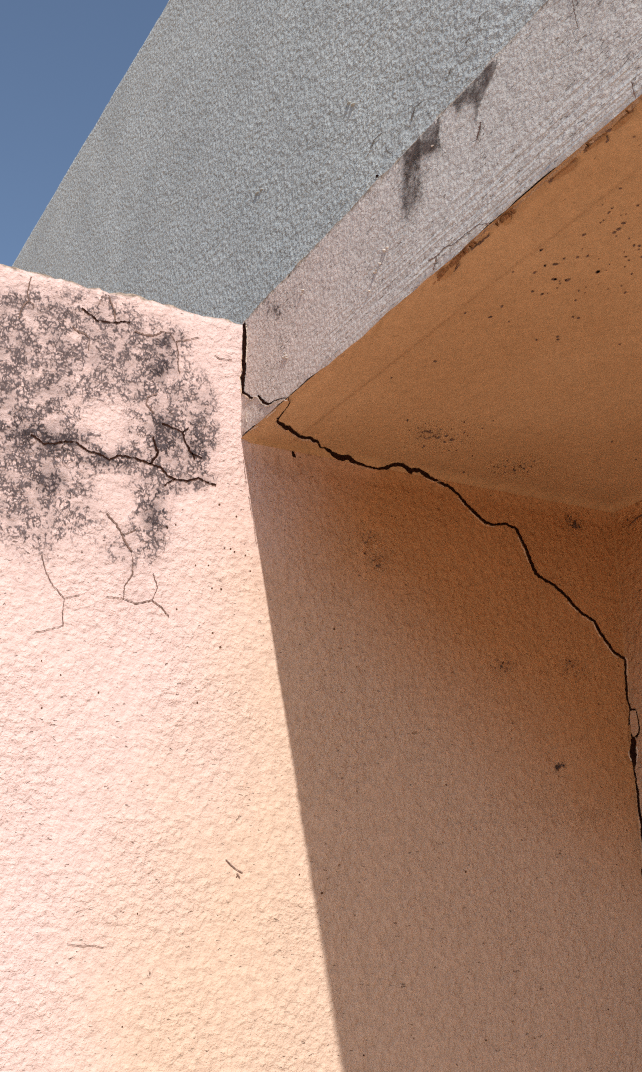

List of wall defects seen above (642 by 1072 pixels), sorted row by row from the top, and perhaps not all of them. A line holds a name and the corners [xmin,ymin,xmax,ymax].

water stain [452,62,496,112]
water stain [403,119,440,212]
crack [428,222,489,270]
water stain [0,286,220,566]
crack [31,393,216,486]
crack [36,555,80,632]
crack [72,295,642,841]